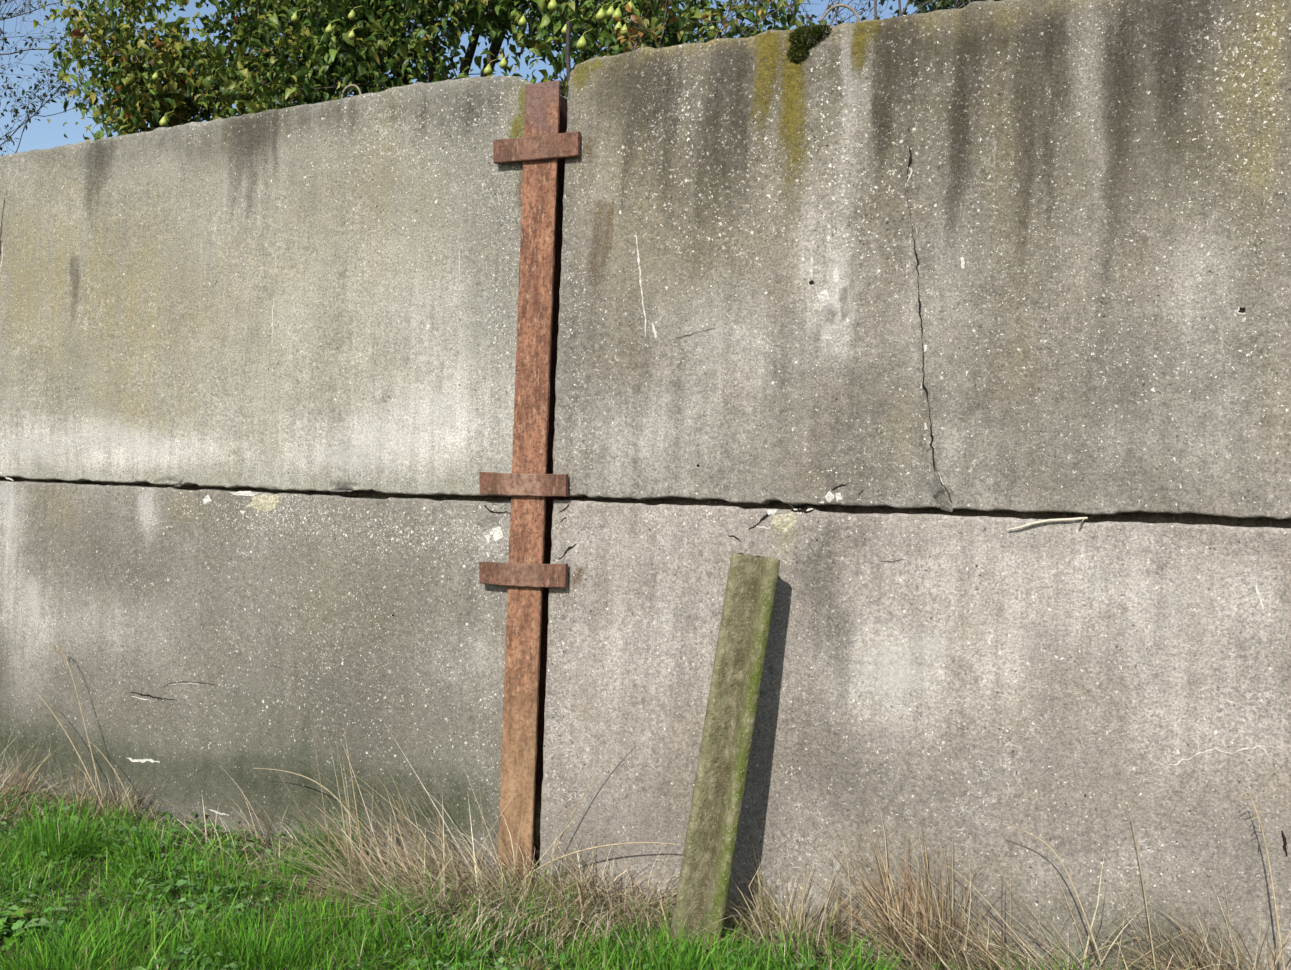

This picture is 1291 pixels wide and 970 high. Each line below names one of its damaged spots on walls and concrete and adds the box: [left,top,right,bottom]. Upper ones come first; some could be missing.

leakage [752,30,806,180]
crack [0,191,8,267]
crack [905,129,953,512]